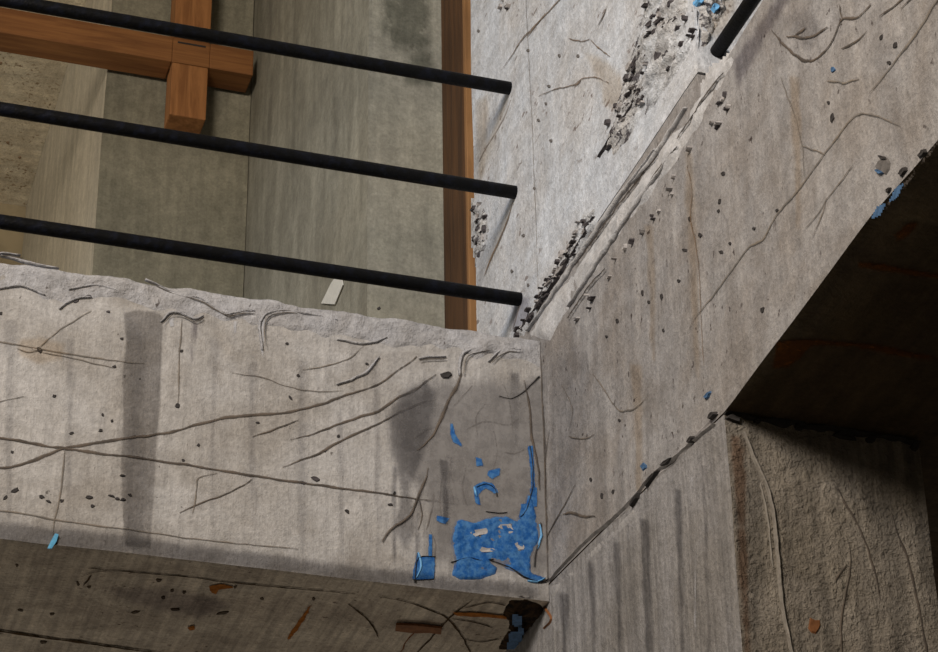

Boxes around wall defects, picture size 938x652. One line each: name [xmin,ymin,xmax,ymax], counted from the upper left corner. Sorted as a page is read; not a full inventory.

crack [504,0,609,142]
spalling [597,0,727,158]
crack [687,0,938,363]
crack [0,311,145,368]
crack [0,348,436,549]
peeling [412,534,436,582]
crack [418,373,472,450]
peeling [450,424,462,446]
leakage [399,382,549,569]
peeling [437,446,549,583]
spalling [499,596,552,650]
crack [547,487,595,536]